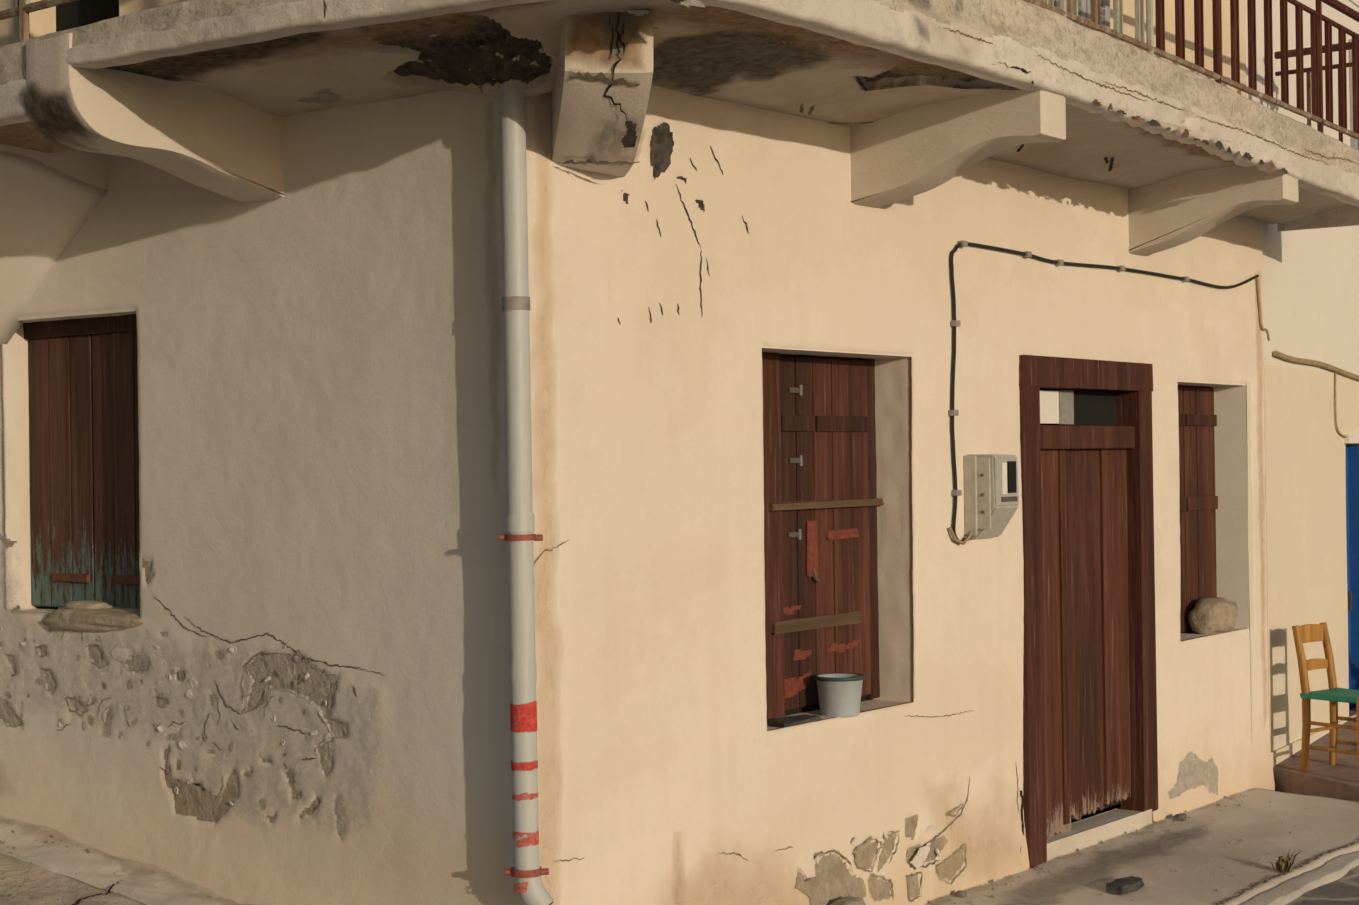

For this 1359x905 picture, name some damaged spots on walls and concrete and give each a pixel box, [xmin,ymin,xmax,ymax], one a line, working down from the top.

spalling [670,0,705,8]
spalling [373,15,552,87]
crack [569,12,640,120]
leakage [571,9,828,94]
spalling [865,63,979,82]
crack [559,157,640,165]
peeling [621,121,687,184]
flaking render [0,534,17,547]
crack [154,596,385,798]
spalling [0,627,348,841]
spalling [1168,751,1219,799]
spalling [794,804,967,905]